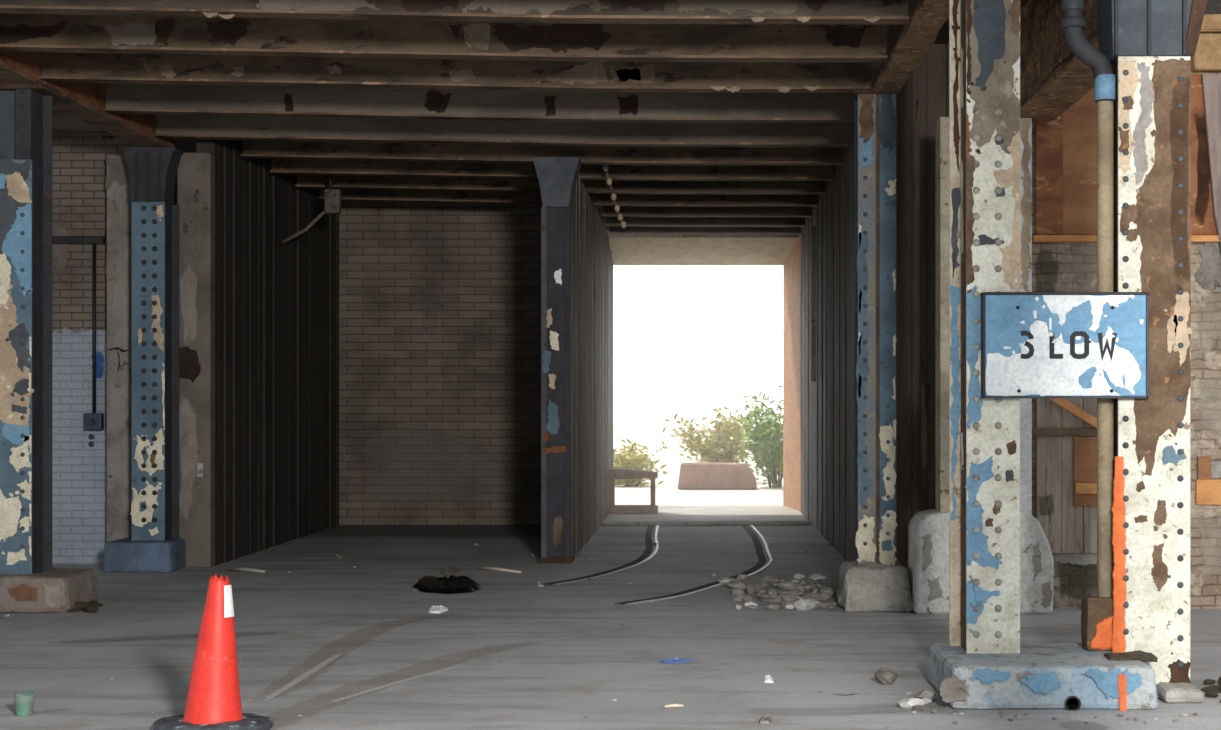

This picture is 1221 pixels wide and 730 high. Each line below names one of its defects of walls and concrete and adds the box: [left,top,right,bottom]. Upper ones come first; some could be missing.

peeling [676,0,811,23]
peeling [961,0,1032,292]
peeling [1118,60,1155,193]
peeling [0,159,34,565]
peeling [130,293,201,536]
peeling [542,308,560,435]
peeling [855,225,898,565]
peeling [949,160,1003,633]
corrosion [1120,58,1210,492]
spalling [921,533,944,602]
peeling [940,668,1062,703]
peeling [1084,668,1143,699]